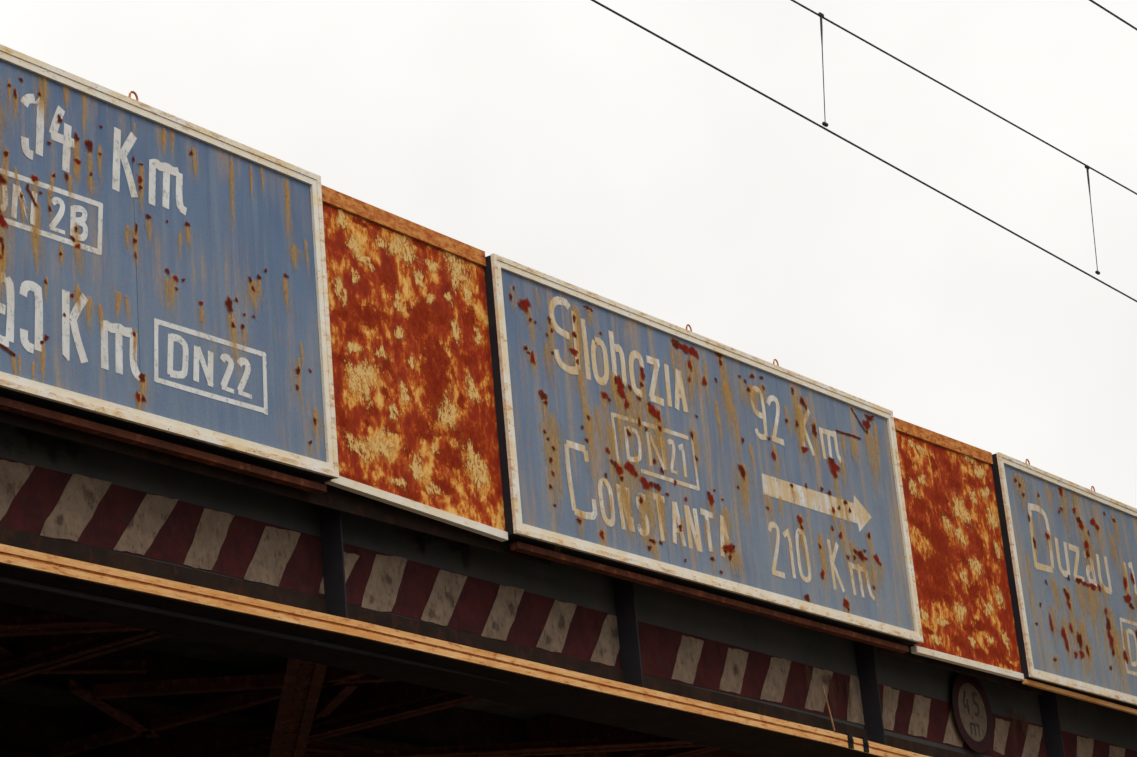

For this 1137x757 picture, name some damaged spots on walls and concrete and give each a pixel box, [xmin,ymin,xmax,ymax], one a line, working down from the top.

corrosion [0,93,102,288]
corrosion [0,334,50,381]
corrosion [225,268,267,345]
corrosion [332,297,485,496]
corrosion [509,286,554,369]
corrosion [569,305,683,554]
corrosion [671,338,765,500]
corrosion [710,540,736,574]
corrosion [765,457,882,589]
corrosion [910,455,994,608]
corrosion [1014,474,1137,609]
corrosion [1030,575,1137,670]